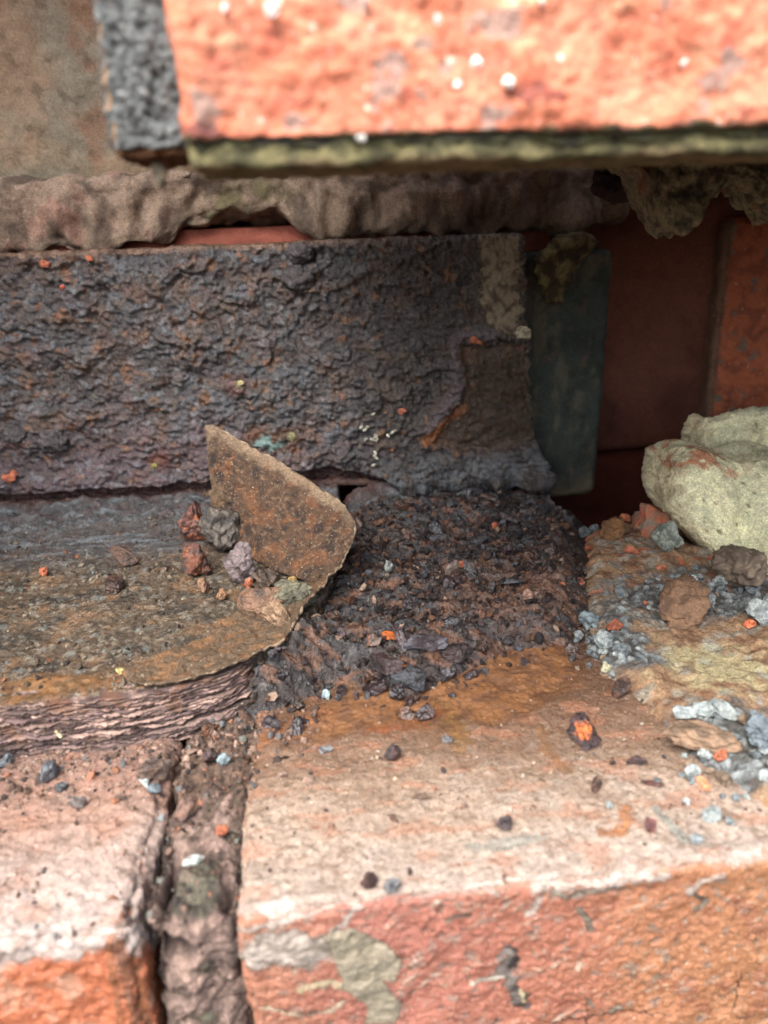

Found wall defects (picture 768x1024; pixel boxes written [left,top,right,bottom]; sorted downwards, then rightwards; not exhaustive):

peeling [244,427,298,452]
rust [256,643,582,747]
crack [146,827,188,979]